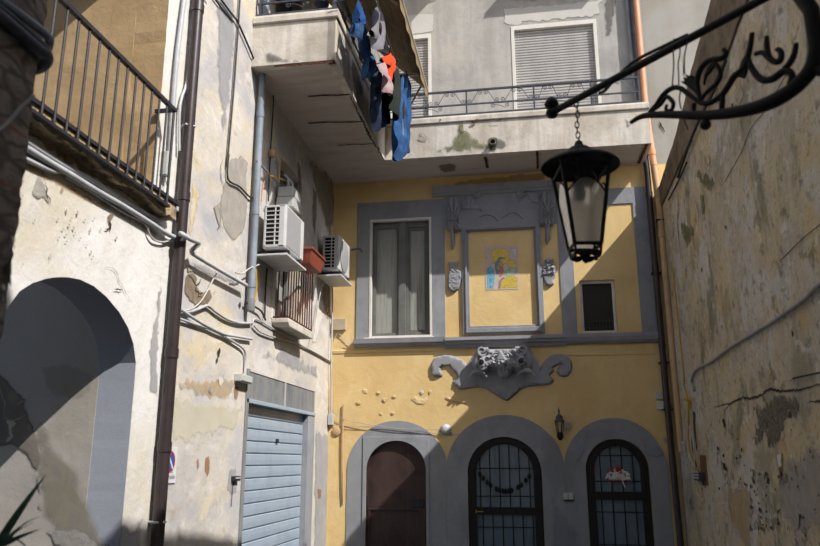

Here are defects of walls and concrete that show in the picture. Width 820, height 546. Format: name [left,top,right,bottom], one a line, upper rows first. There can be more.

flaking render [32,177,51,203]
peeling [214,156,248,240]
flaking render [185,266,212,305]
peeling [180,376,234,397]
crack [714,384,820,419]
peeling [0,376,42,491]
peeling [48,528,108,546]